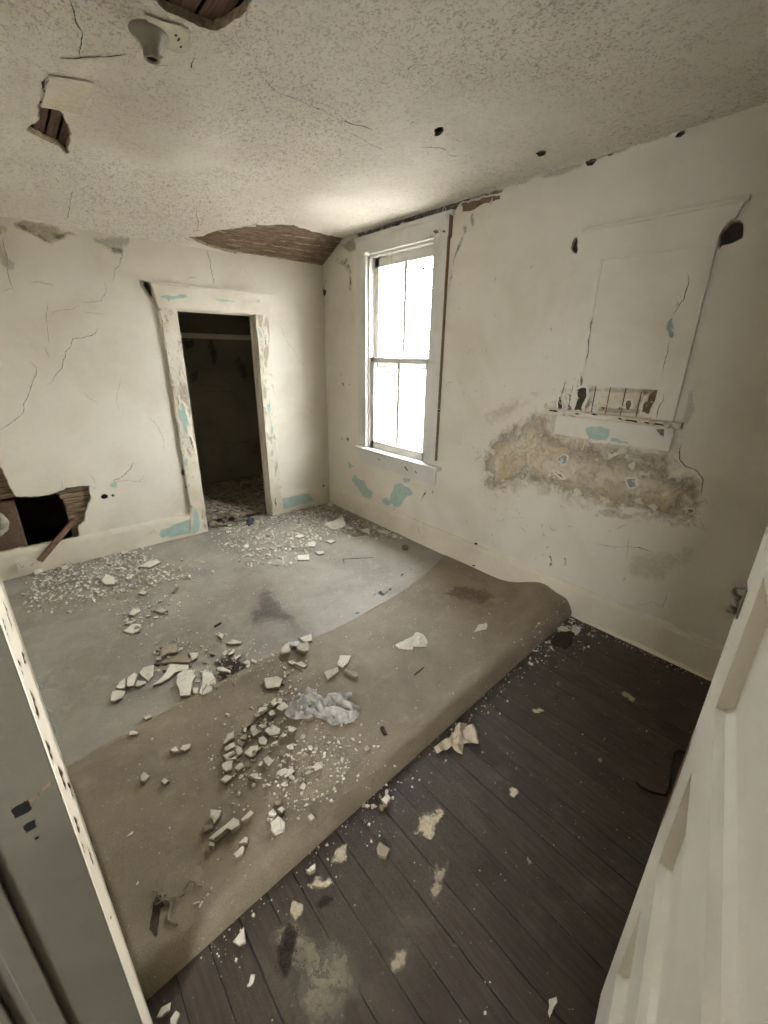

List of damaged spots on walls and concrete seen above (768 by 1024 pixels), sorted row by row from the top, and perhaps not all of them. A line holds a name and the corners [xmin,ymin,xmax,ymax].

crack [39,0,127,104]
flaking render [40,74,95,115]
flaking render [460,193,503,215]
crack [0,236,124,431]
peeling [256,326,270,357]
peeling [264,379,325,511]
peeling [549,373,666,447]
spalling [0,467,92,553]
peeling [157,507,202,540]
peeling [351,465,434,511]